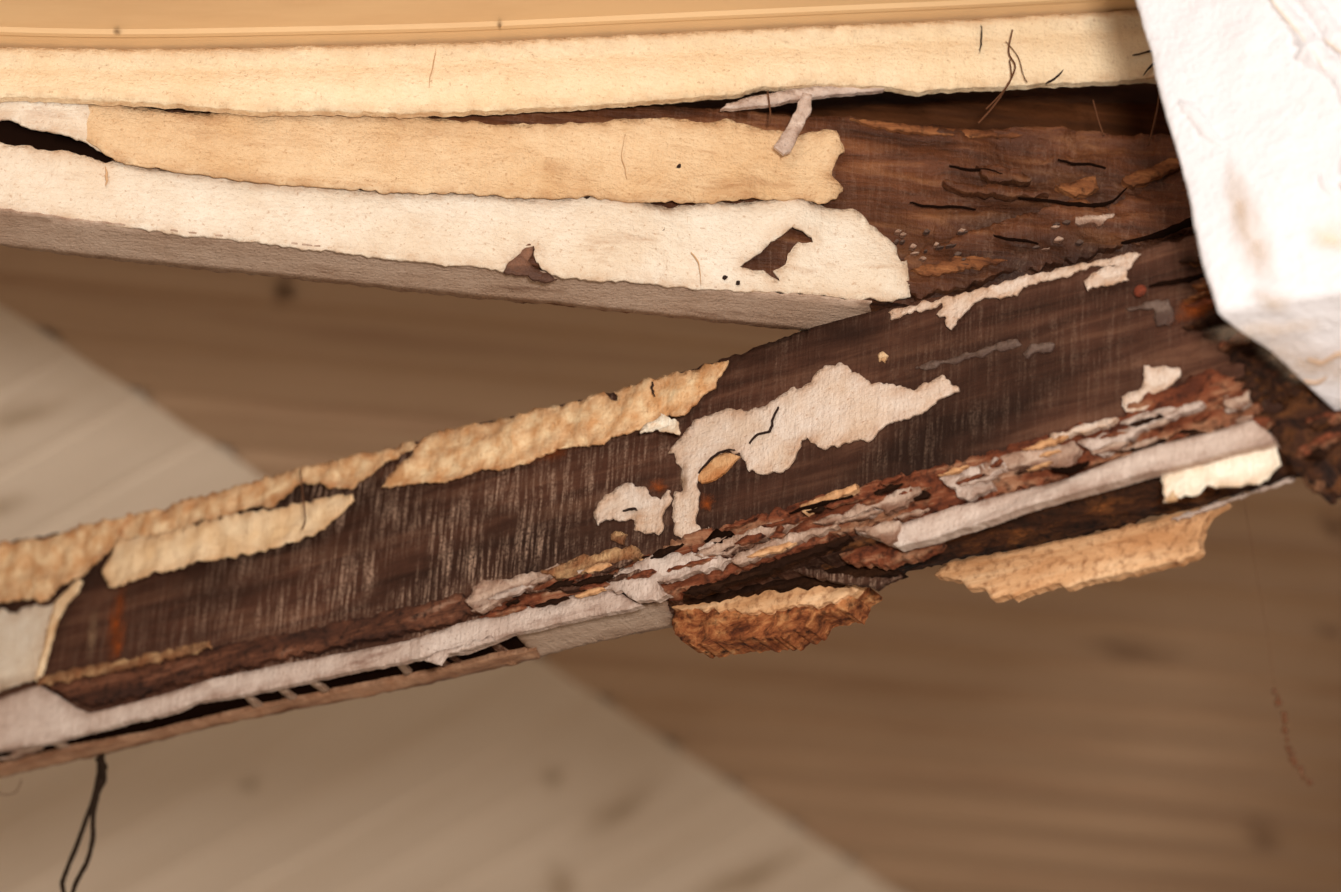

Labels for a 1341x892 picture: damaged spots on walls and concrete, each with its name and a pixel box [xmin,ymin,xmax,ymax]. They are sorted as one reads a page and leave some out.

crack [949,159,1127,208]
peeling [0,93,1141,330]
crack [910,202,1039,245]
crack [1121,195,1194,244]
crack [1149,272,1206,287]
peeling [1126,299,1175,327]
peeling [1223,391,1253,413]
peeling [939,365,1206,502]
peeling [1161,446,1281,503]
peeling [0,339,1055,691]